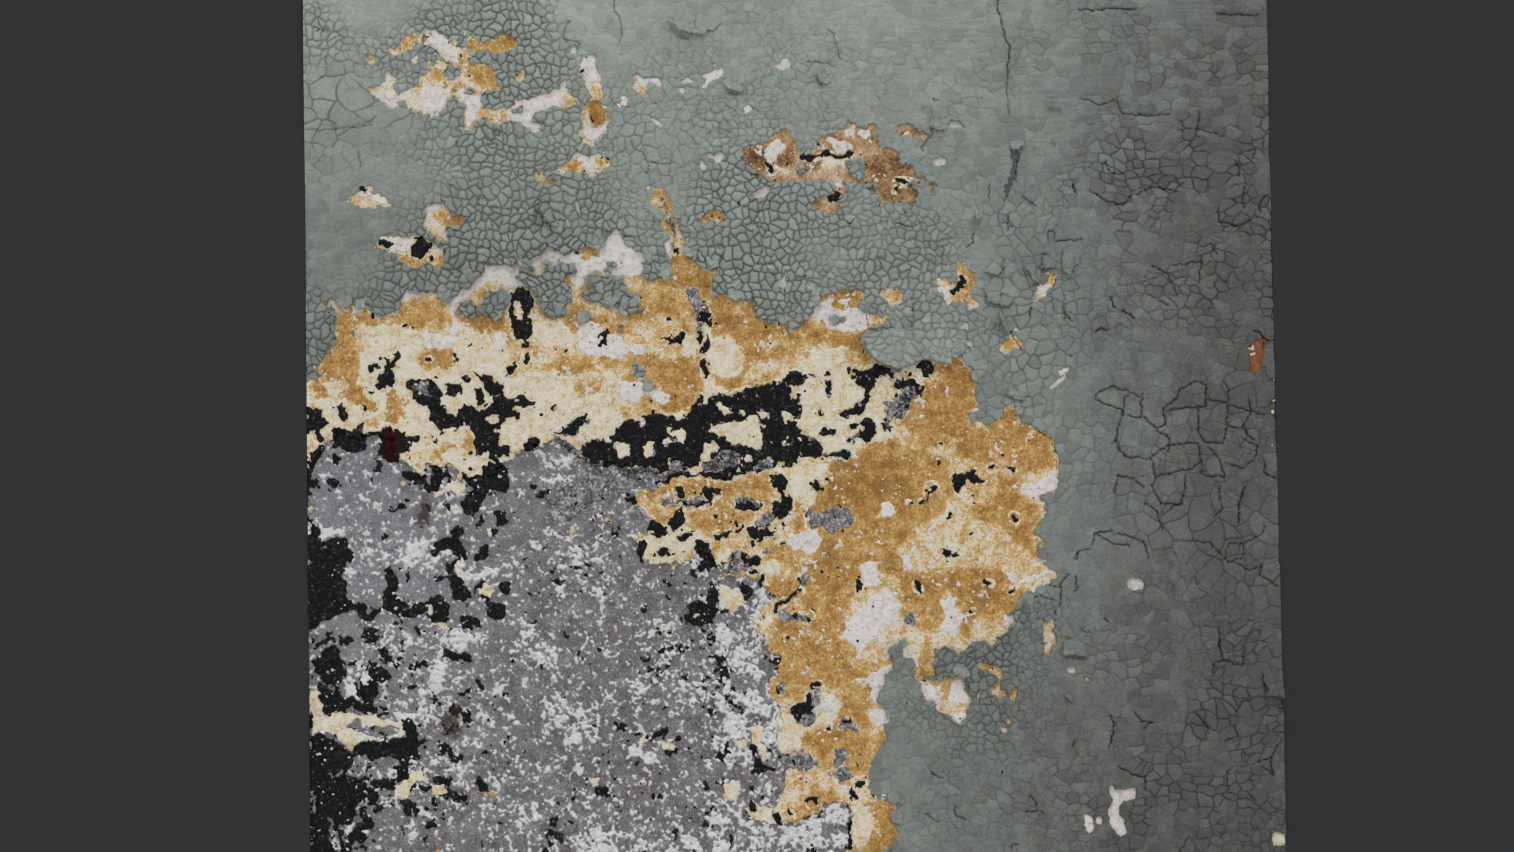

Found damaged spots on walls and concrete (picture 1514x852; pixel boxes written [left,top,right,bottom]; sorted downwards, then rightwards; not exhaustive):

crack [997,0,1010,106]
crack [971,156,1269,349]
peeling [1260,339,1275,383]
peeling [306,28,1090,852]
crack [1034,381,1277,633]
crack [1212,630,1245,674]
crack [1073,713,1153,789]
crack [1197,714,1282,785]
peeling [1083,784,1136,836]